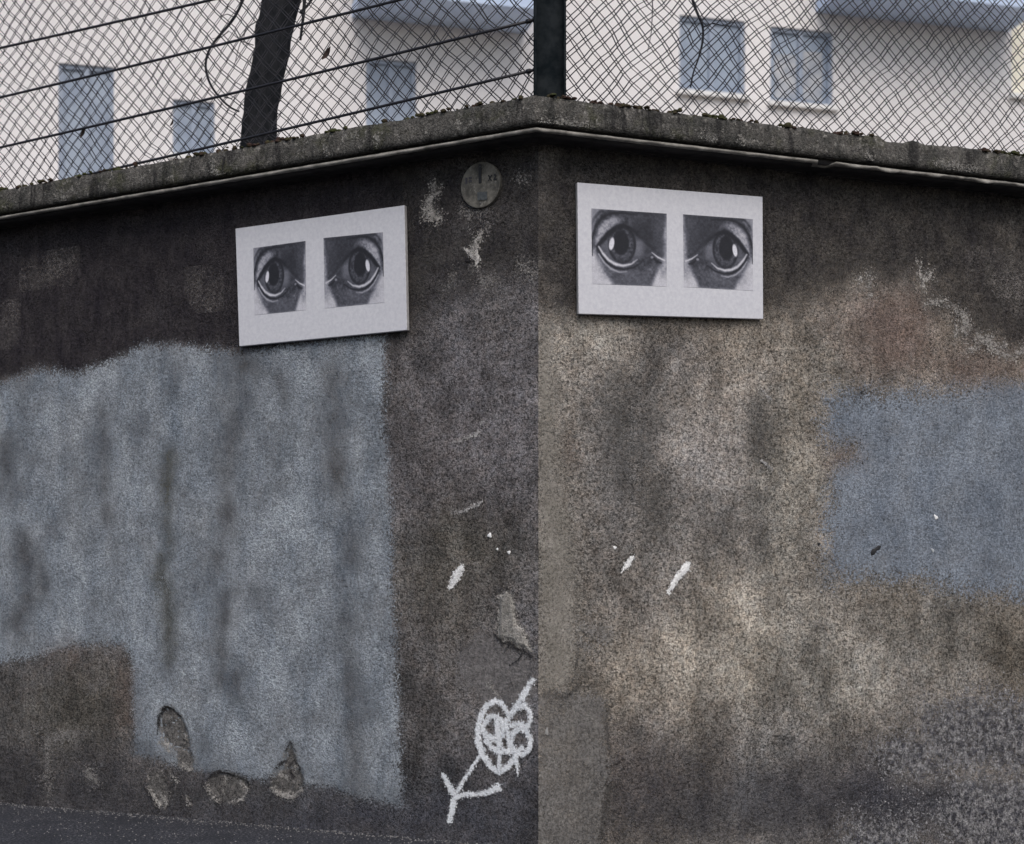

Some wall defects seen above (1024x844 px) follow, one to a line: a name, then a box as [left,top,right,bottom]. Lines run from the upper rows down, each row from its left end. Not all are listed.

damp [0,142,1024,384]
flaking render [452,586,538,715]
flaking render [144,703,196,812]
flaking render [203,769,250,806]
flaking render [270,741,308,801]